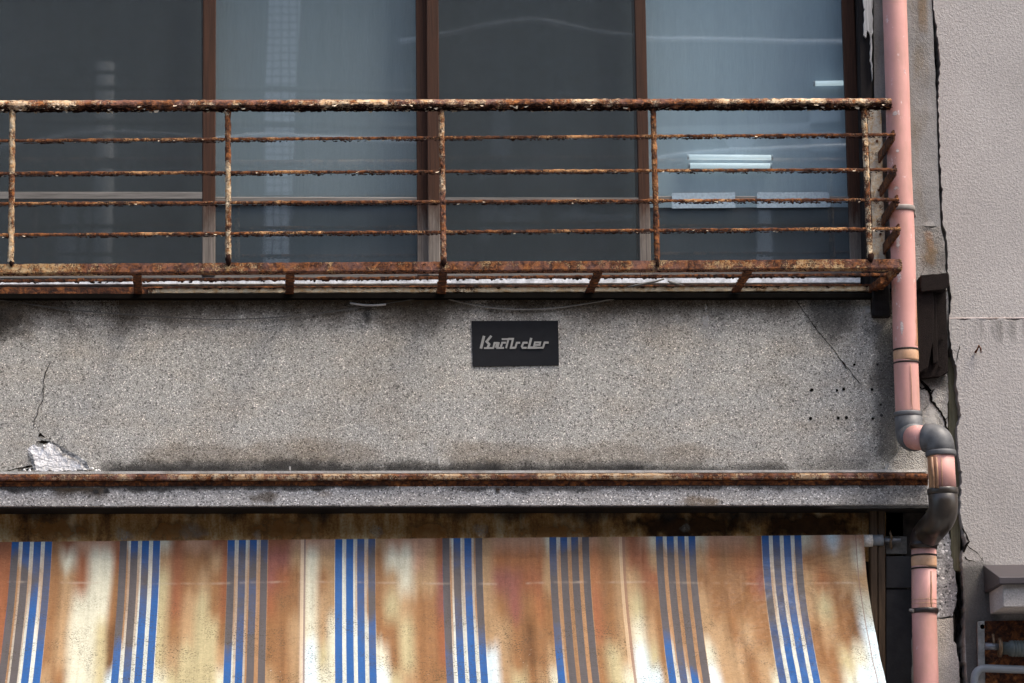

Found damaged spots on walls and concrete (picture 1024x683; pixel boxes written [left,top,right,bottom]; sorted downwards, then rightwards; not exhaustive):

rust [0,102,893,144]
rust [612,135,891,151]
rust [185,156,901,287]
rust [61,250,830,290]
crack [796,301,860,383]
crack [33,364,50,430]
crack [919,380,949,431]
spalling [23,433,101,472]
water stain [106,442,716,471]
rust [518,524,602,538]
rust [625,513,746,536]
rust [768,513,854,536]